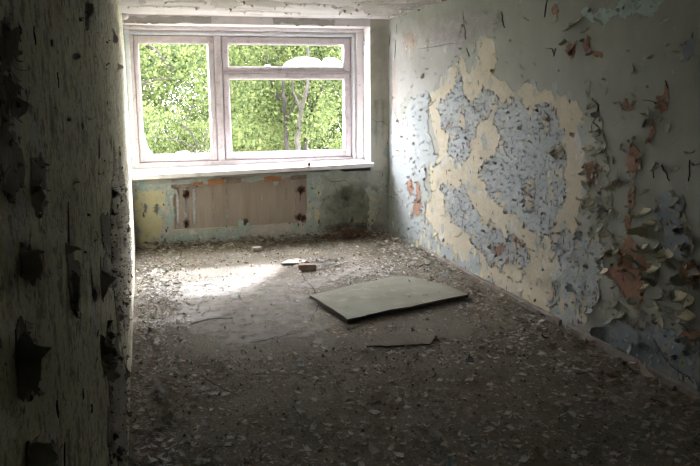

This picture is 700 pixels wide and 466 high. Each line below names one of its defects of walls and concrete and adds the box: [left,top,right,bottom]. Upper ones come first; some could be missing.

peeling [79,1,118,43]
peeling [0,17,50,219]
peeling [123,0,700,392]
peeling [19,242,50,287]
peeling [65,243,87,319]
peeling [93,139,379,466]
peeling [15,316,52,402]
peeling [26,434,62,466]